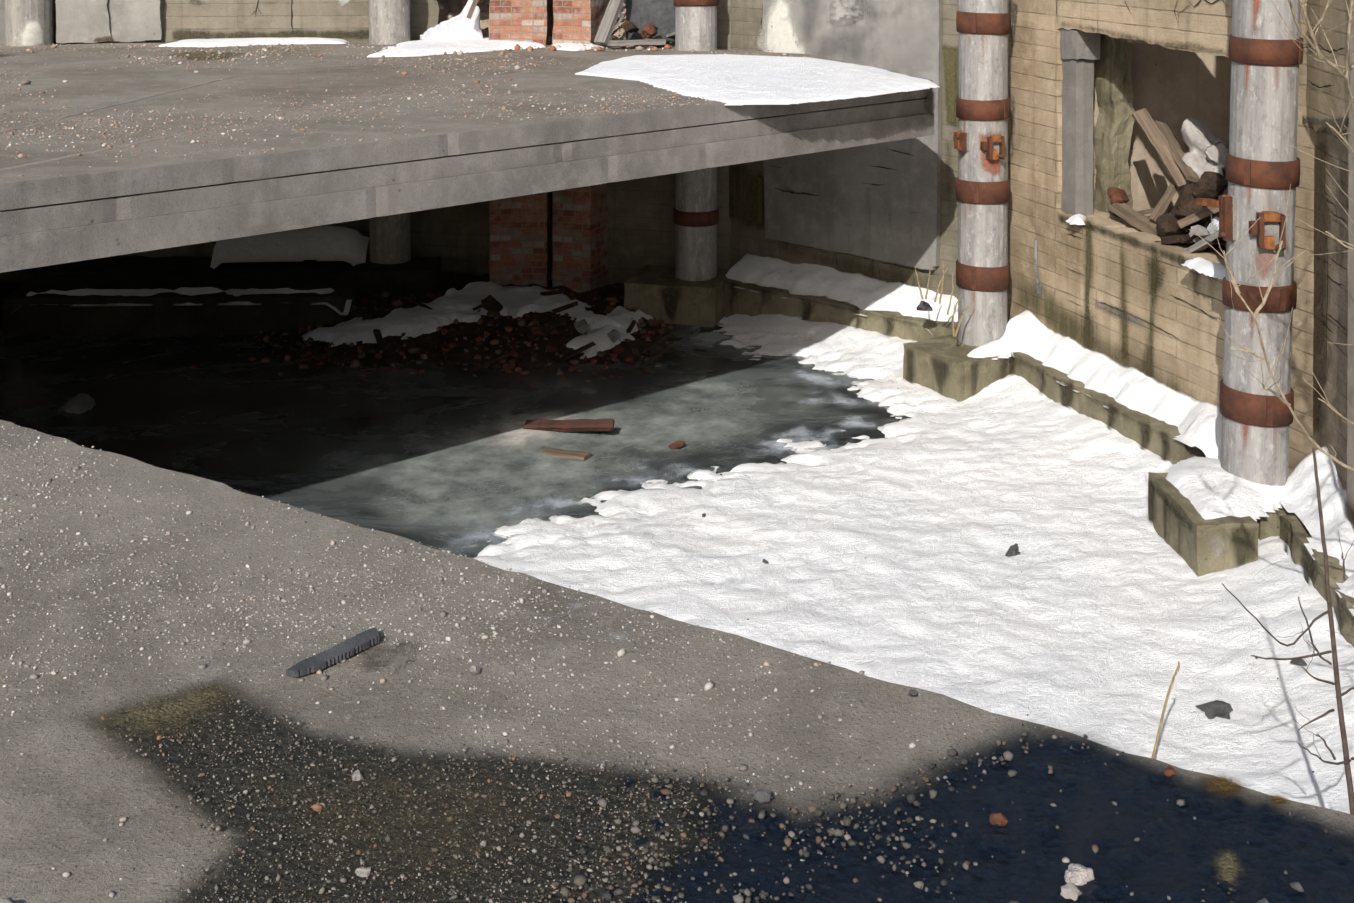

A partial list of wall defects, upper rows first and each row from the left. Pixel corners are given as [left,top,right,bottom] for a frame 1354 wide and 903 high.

corrosion [981,136,1000,174]